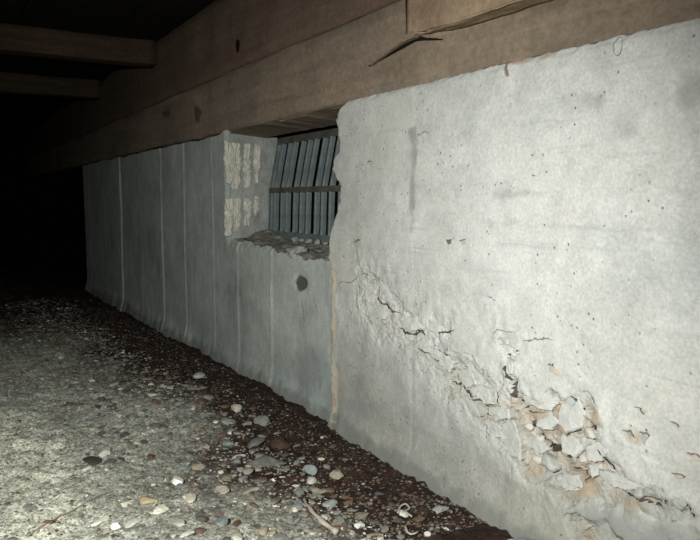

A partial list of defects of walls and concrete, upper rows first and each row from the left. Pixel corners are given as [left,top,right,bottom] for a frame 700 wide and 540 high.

crack [339,245,380,298]
spalling [356,263,694,540]